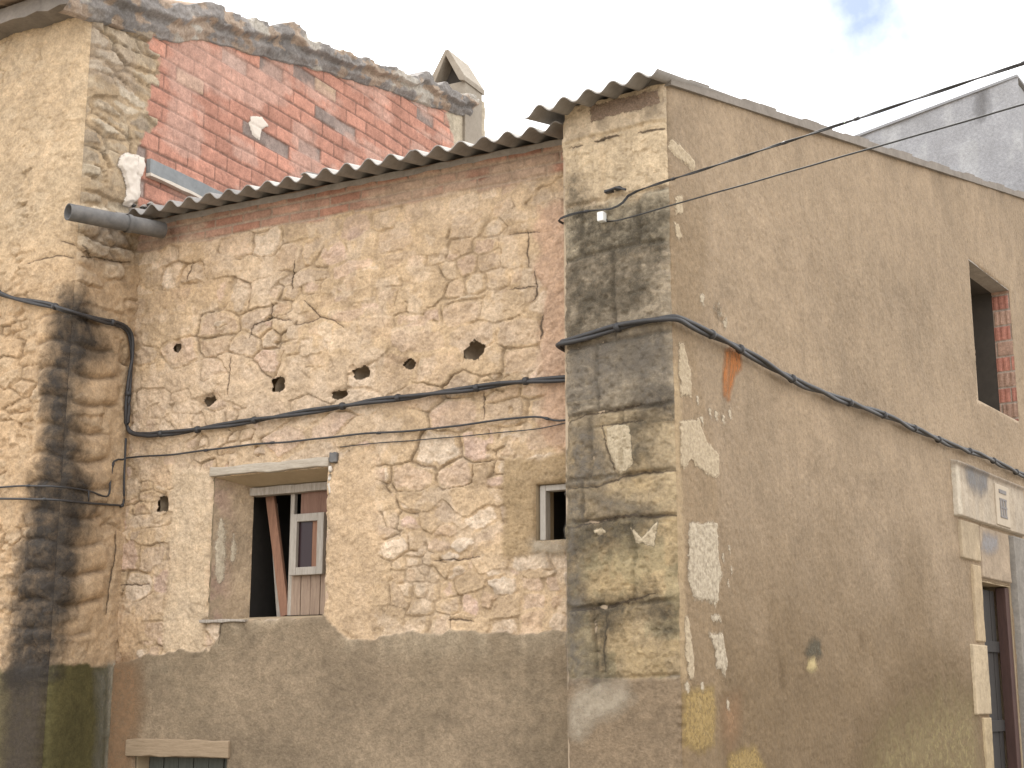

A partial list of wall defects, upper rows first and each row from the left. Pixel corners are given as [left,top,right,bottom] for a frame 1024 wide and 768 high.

crack [249,261,340,338]
crack [516,232,544,339]
water stain [567,266,649,334]
water stain [569,335,670,423]
spalling [607,424,634,475]
peeling [678,342,731,478]
corrosion [723,349,741,397]
water stain [4,294,104,768]
spalling [630,519,658,546]
peeling [687,521,732,675]
peeling [682,616,730,750]